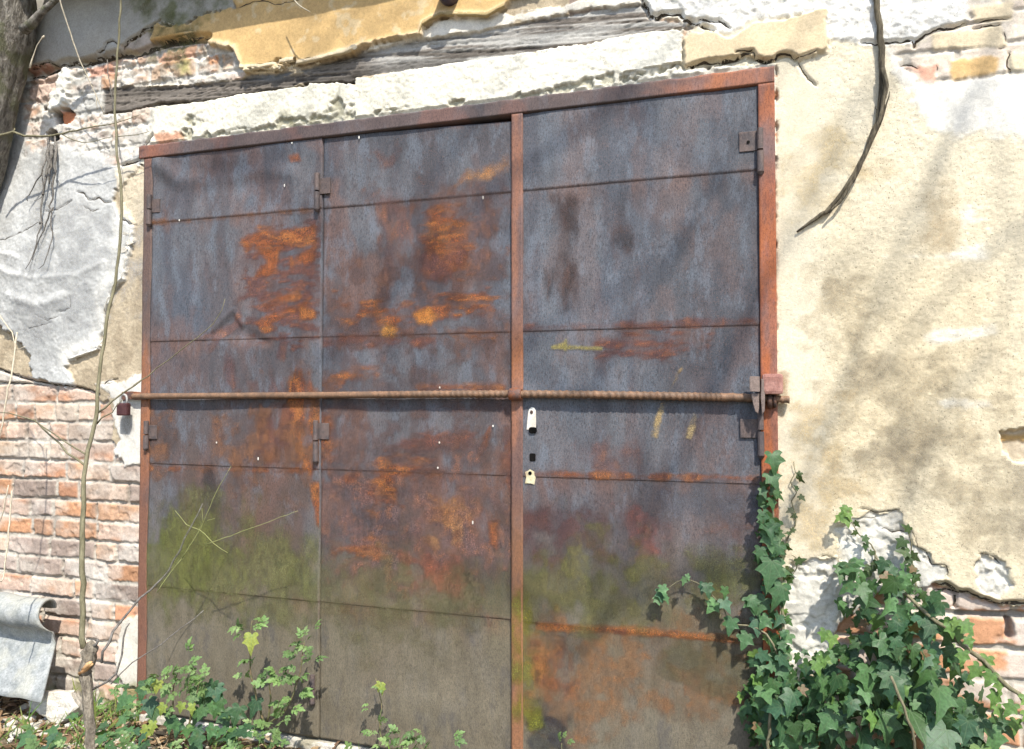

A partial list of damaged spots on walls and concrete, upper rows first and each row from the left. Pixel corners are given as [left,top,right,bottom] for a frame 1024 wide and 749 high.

peeling [419,2,505,32]
spalling [20,43,358,124]
spalling [619,54,774,86]
spalling [247,88,538,132]
corrosion [208,210,355,346]
corrosion [348,299,400,344]
corrosion [404,293,493,323]
corrosion [596,319,704,359]
spalling [999,427,1024,461]
spalling [785,509,1024,749]